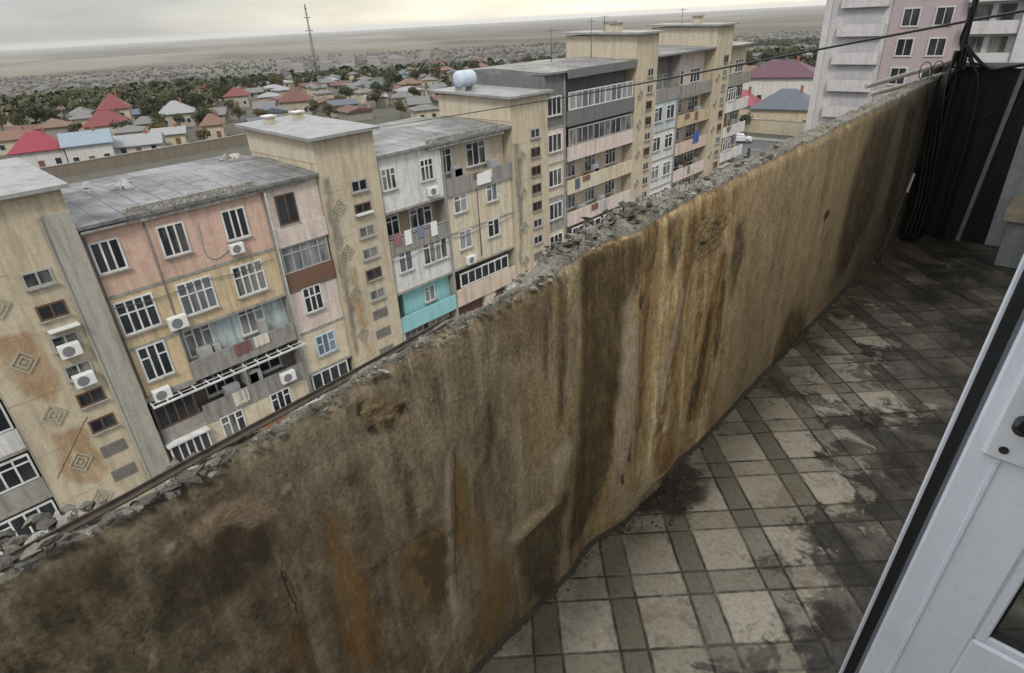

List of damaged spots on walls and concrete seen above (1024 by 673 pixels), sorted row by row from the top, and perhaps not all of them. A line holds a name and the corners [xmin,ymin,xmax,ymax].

spalling [692,213,730,261]
spalling [356,398,407,435]
damp [525,238,641,597]
crack [280,569,303,647]